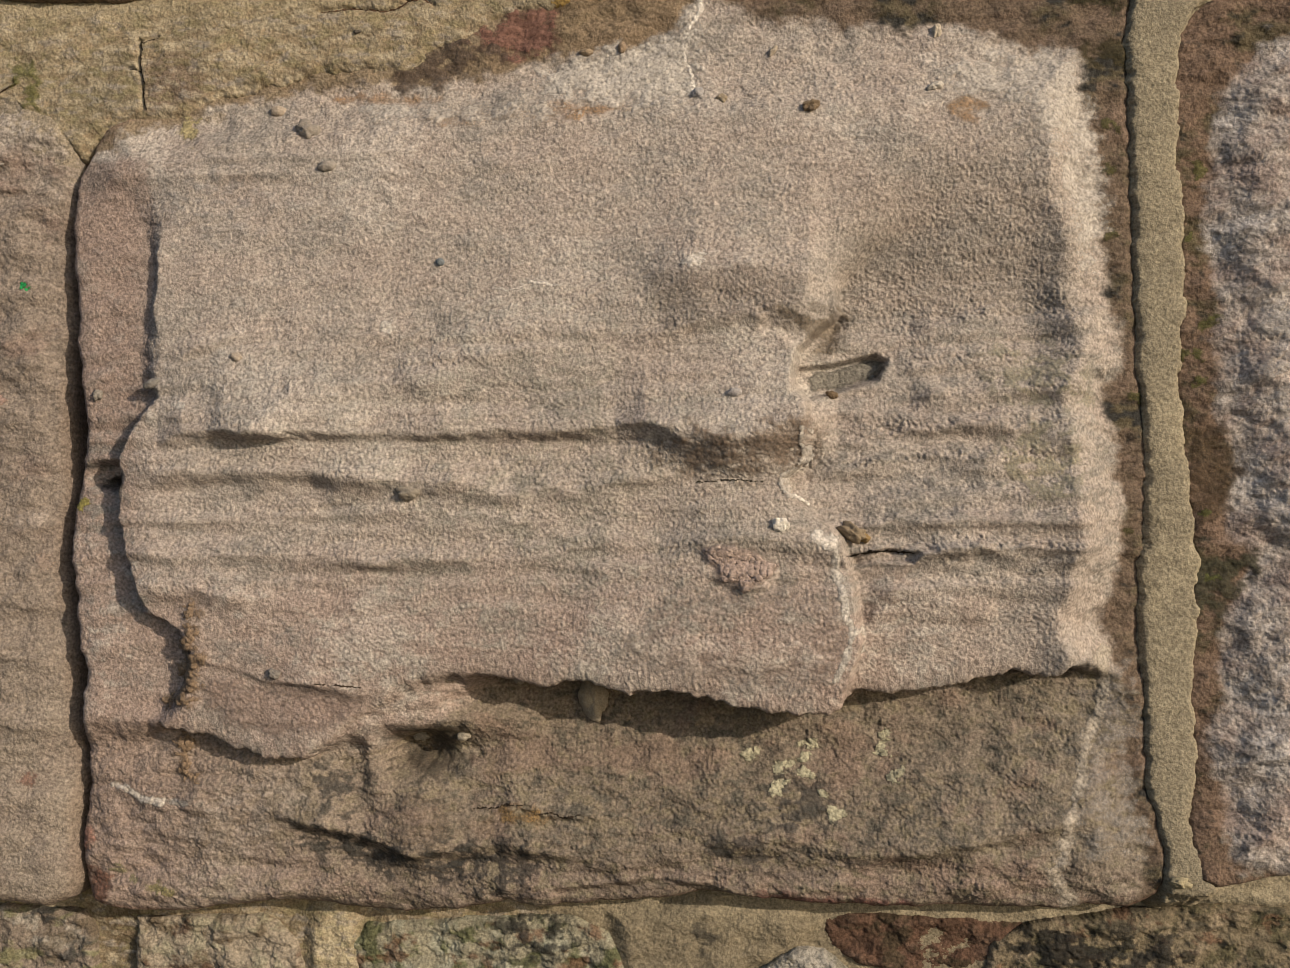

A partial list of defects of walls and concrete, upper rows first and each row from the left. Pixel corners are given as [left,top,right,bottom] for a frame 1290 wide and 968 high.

spalling [392,718,463,778]